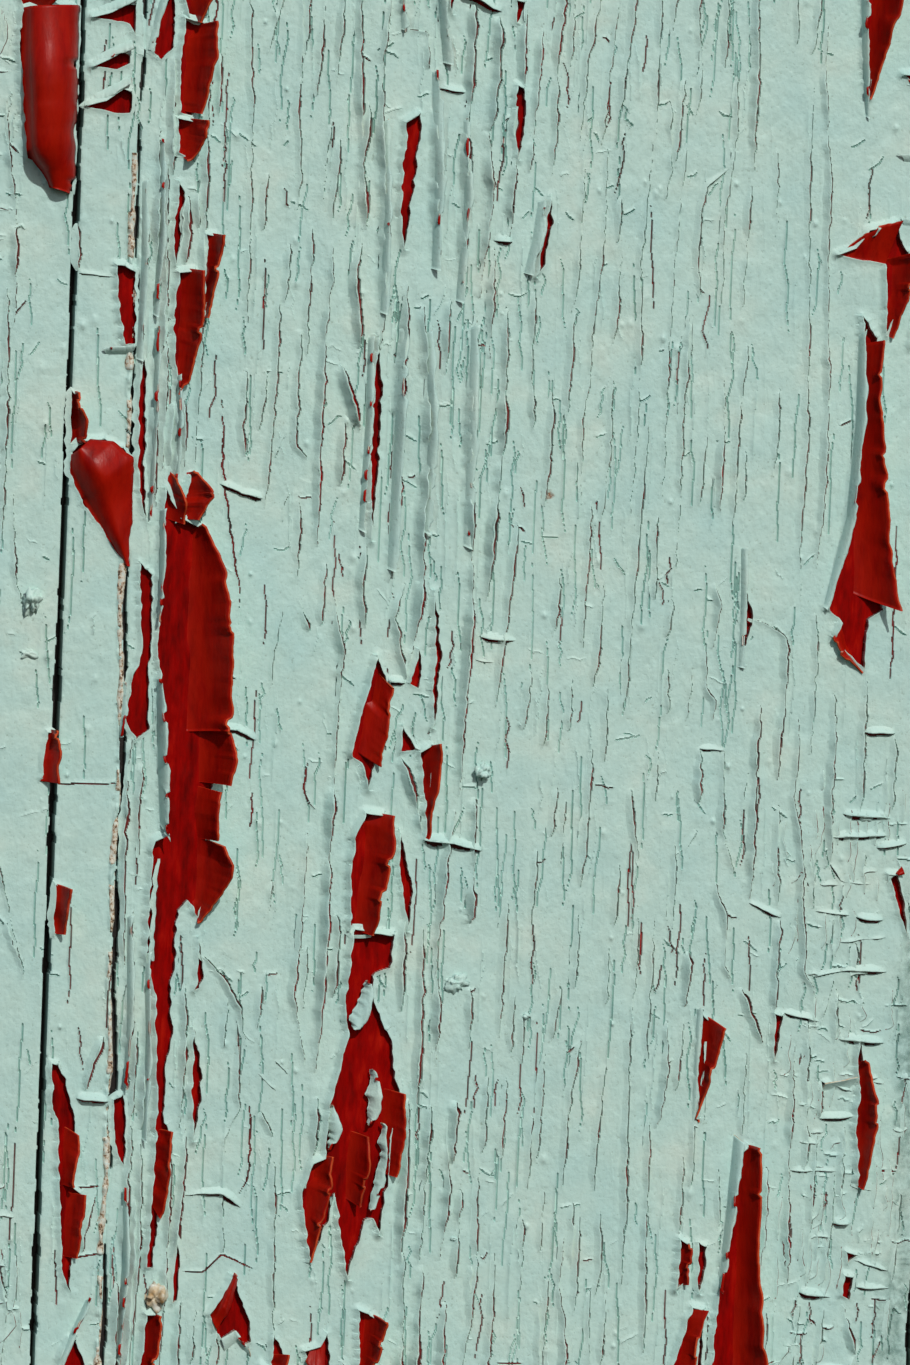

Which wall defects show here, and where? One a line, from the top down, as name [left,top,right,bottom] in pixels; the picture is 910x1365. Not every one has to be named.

crack [0,107,21,605]
crack [0,1249,22,1365]
crack [71,223,114,277]
peeling [14,0,238,1365]
crack [59,740,277,1365]
peeling [296,592,445,1281]
crack [135,0,779,1365]
peeling [667,1135,769,1365]
crack [662,23,910,1365]
peeling [822,1035,879,1190]
peeling [824,218,910,673]
peeling [859,0,904,119]